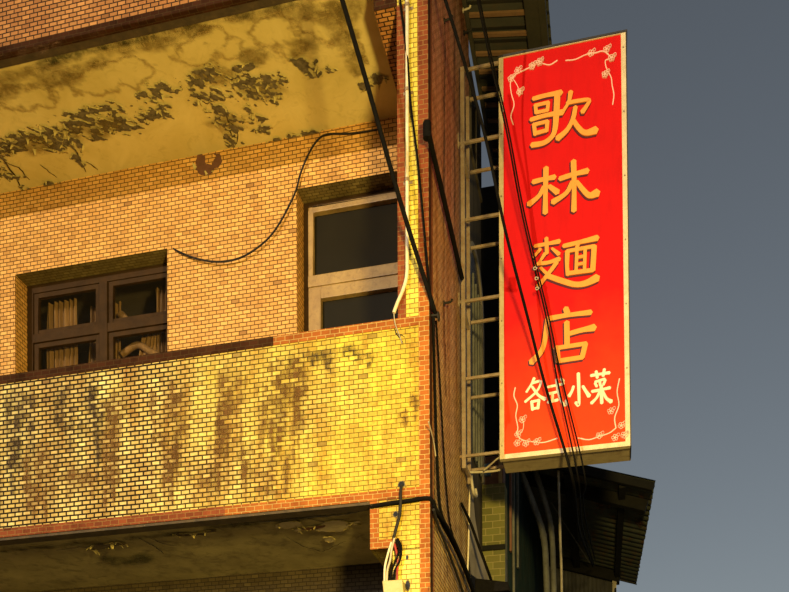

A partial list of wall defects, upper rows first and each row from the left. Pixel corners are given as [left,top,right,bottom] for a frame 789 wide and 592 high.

leakage [0,23,211,98]
peeling [287,57,338,80]
peeling [0,62,323,190]
leakage [4,393,54,515]
leakage [55,389,81,447]
leakage [68,394,121,503]
leakage [158,383,189,500]
leakage [190,372,242,493]
leakage [241,447,256,492]
leakage [257,352,330,496]
spalling [275,520,361,543]